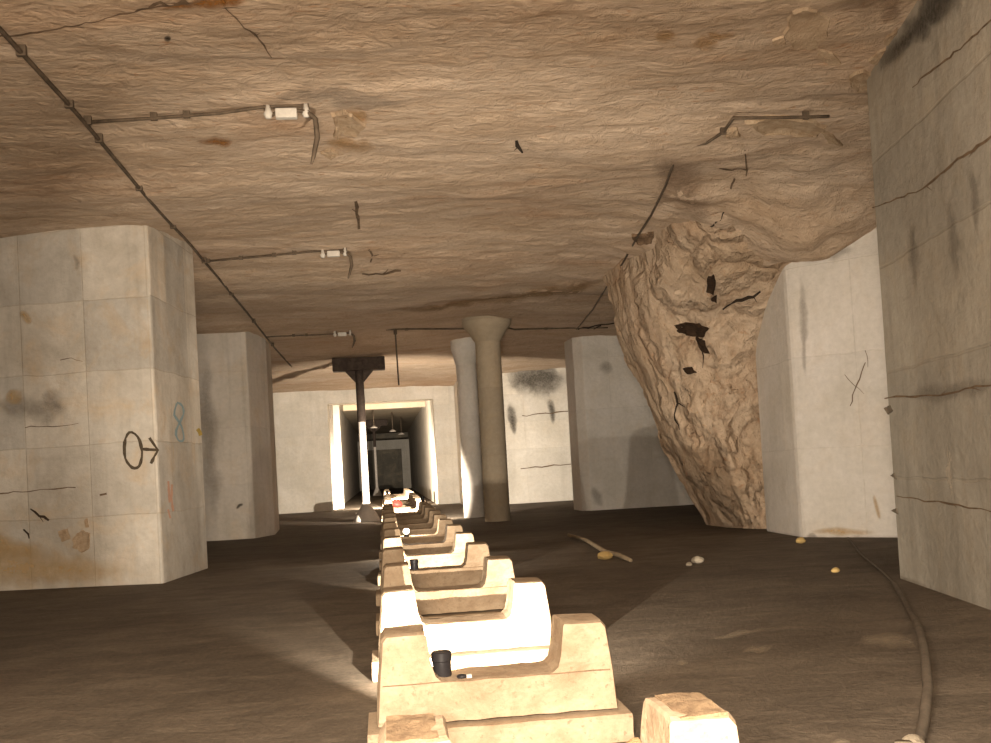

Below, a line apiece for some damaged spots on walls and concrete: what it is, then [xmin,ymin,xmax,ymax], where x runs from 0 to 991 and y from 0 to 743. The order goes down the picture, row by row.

crack [0,0,272,58]
leakage [892,0,951,57]
crack [912,19,991,88]
crack [872,136,991,208]
spalling [706,274,717,303]
spalling [674,322,710,354]
leakage [514,369,558,391]
crack [845,351,991,406]
crack [0,487,76,539]
crack [897,496,991,512]